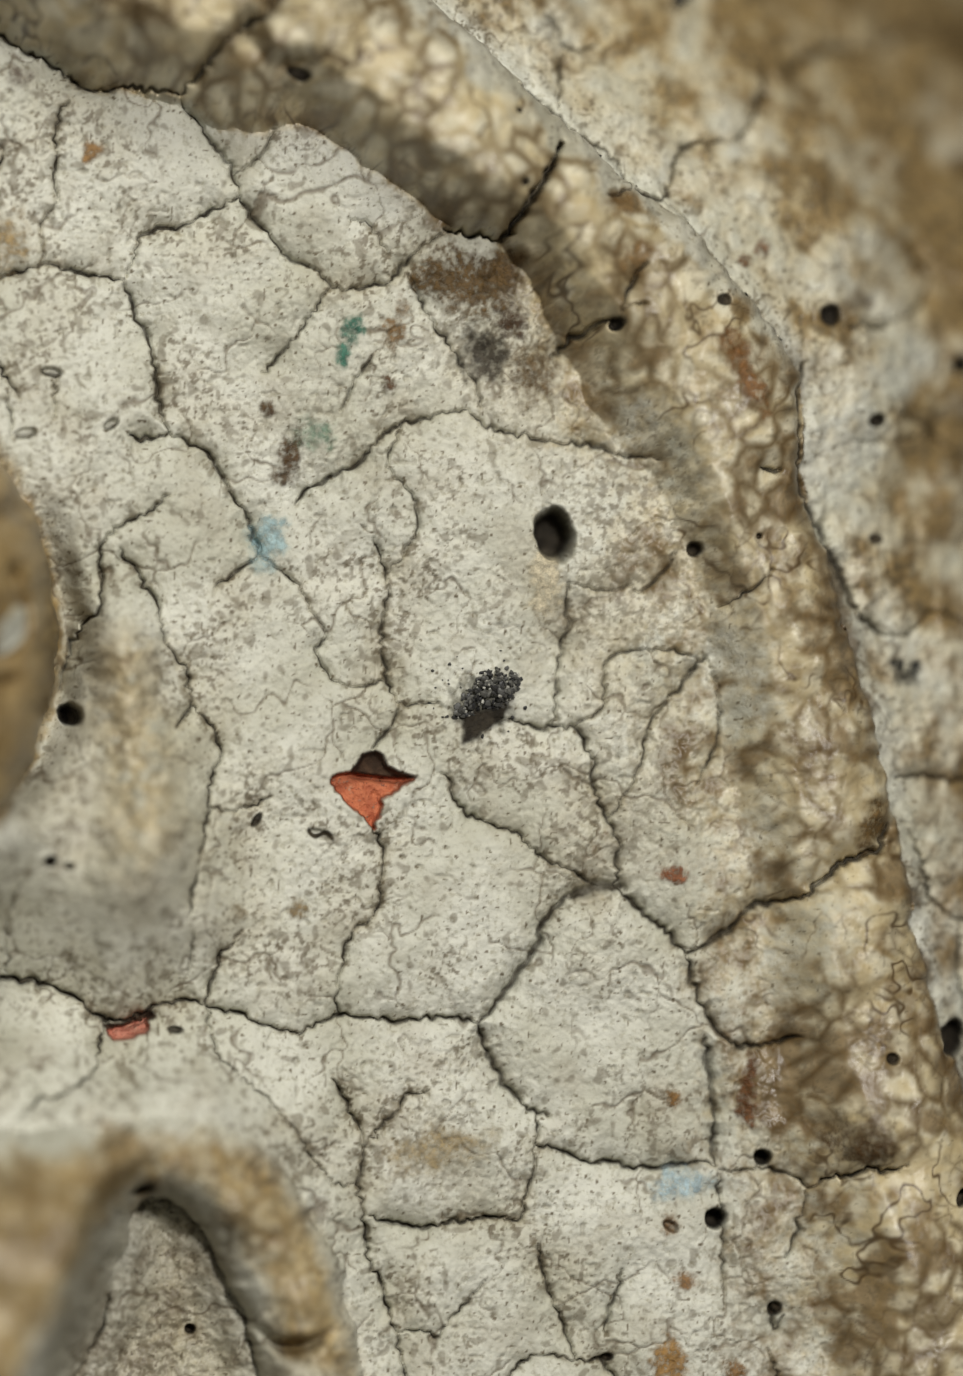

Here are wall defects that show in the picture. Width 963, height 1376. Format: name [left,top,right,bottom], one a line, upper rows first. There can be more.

crack [593,48,765,202]
crack [0,1,646,748]
crack [760,365,963,636]
peeling [331,751,415,830]
peeling [104,1010,156,1040]
crack [0,495,963,1376]